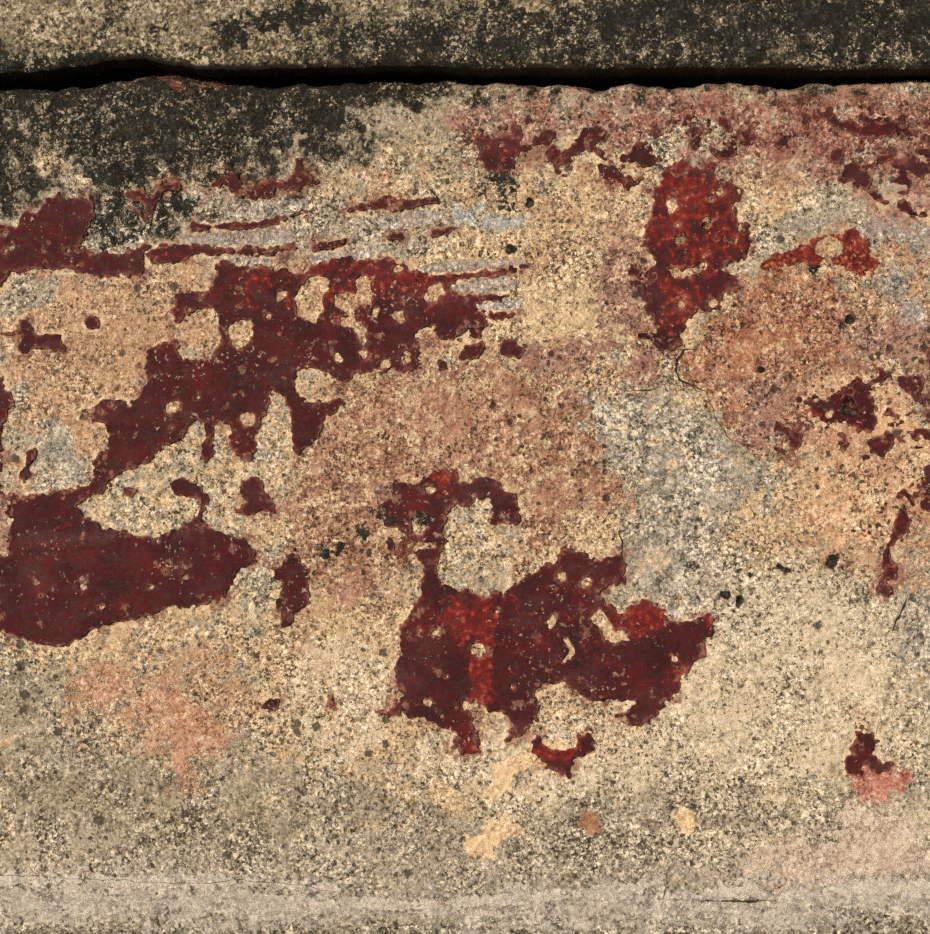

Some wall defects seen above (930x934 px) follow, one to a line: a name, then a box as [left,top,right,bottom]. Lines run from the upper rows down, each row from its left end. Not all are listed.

water stain [0,8,120,73]
water stain [148,23,168,36]
water stain [0,77,362,266]
water stain [308,247,374,264]
water stain [417,258,526,311]
peeling [469,105,760,350]
peeling [794,97,930,217]
peeling [0,158,529,647]
peeling [774,347,930,462]
peeling [375,382,777,779]
peeling [876,464,930,597]
peeling [844,724,893,776]